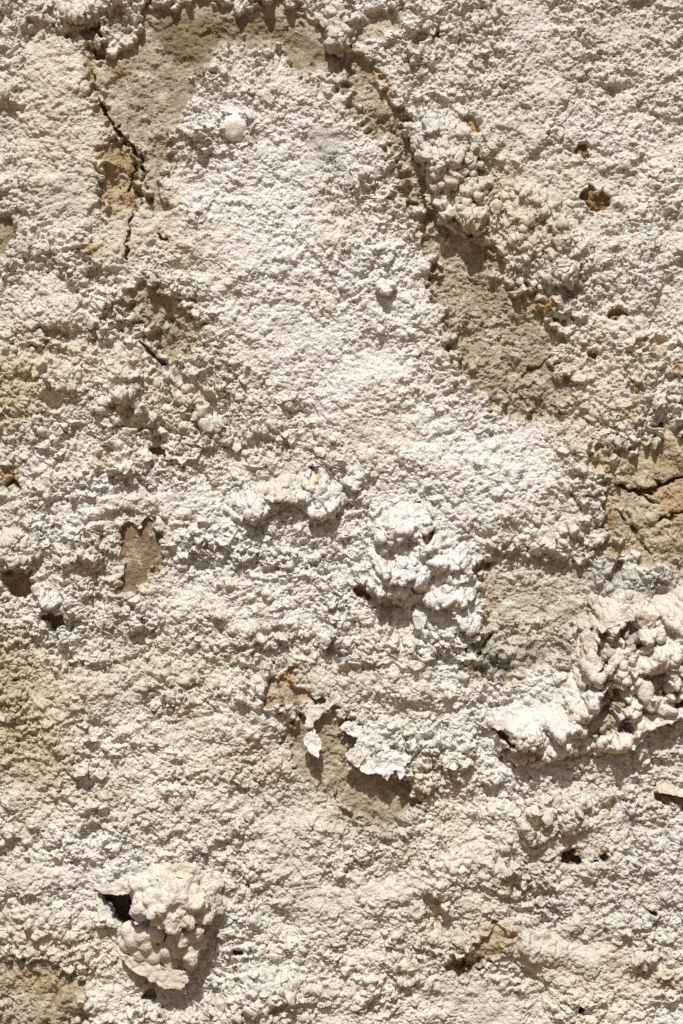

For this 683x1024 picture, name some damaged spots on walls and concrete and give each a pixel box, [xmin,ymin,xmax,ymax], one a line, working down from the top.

crack [91,68,146,261]
spalling [113,517,164,603]
spalling [471,422,683,686]
crack [601,476,683,554]
spalling [263,665,427,827]